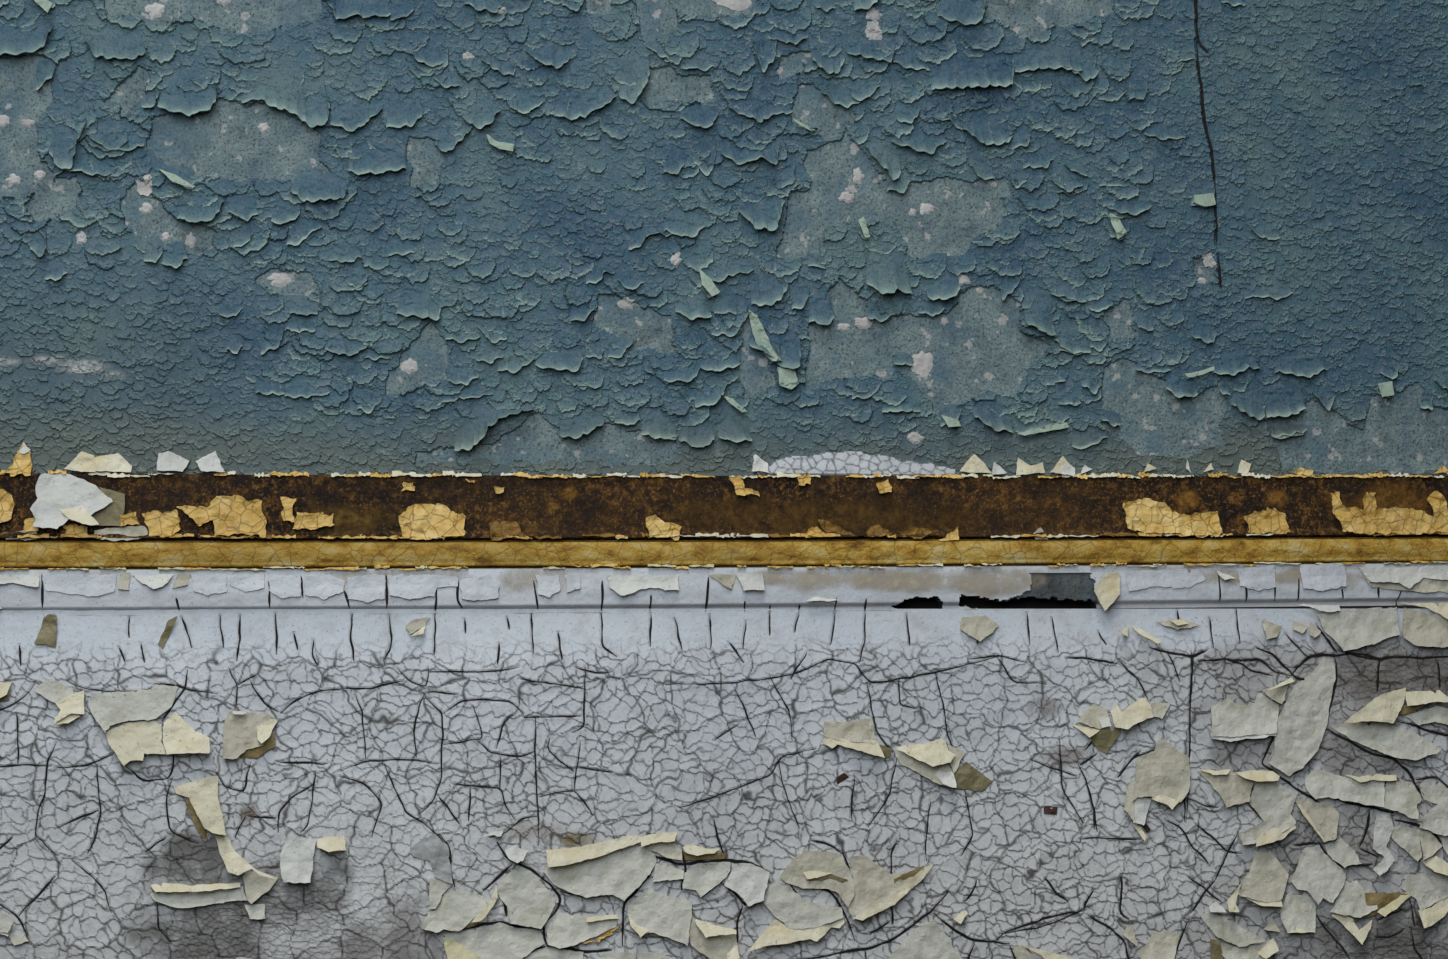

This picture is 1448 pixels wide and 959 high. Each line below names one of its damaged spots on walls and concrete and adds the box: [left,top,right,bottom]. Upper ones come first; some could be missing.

crack [1194,0,1222,287]
corrosion [1178,491,1198,509]
corrosion [1361,486,1427,511]
peeling [35,679,278,766]
crack [0,574,1448,959]
peeling [823,718,992,792]
peeling [888,560,1448,959]
peeling [0,911,29,945]
peeling [150,776,346,919]
peeling [410,831,933,959]